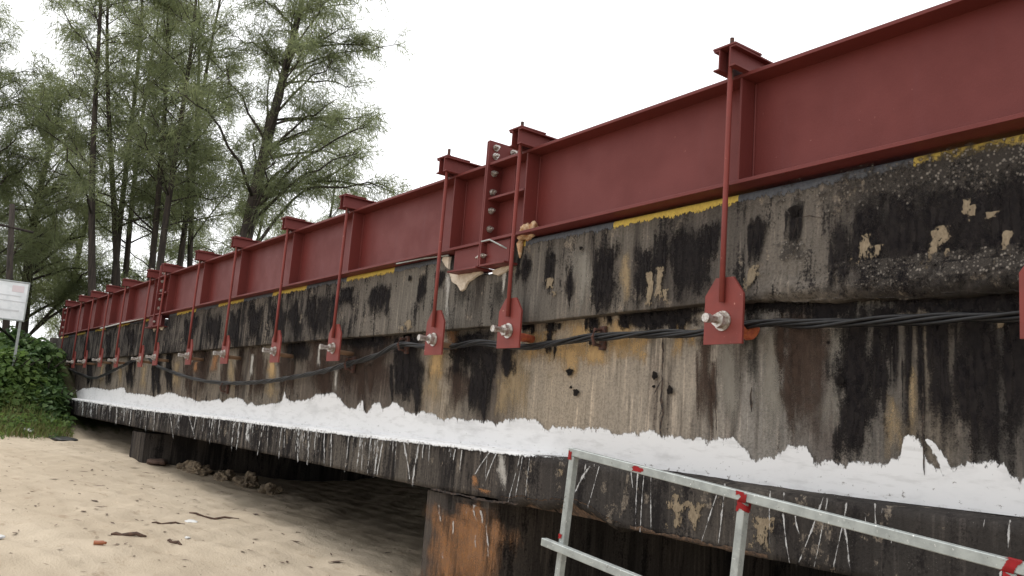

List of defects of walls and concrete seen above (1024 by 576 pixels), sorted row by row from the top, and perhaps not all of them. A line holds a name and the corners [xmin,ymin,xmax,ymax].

spalling [776,134,1024,222]
leakage [367,281,391,317]
leakage [416,269,466,314]
flaking render [442,257,509,292]
peeling [645,266,669,306]
leakage [493,168,1024,471]
spalling [773,225,1024,298]
leakage [83,287,529,423]
leakage [498,455,507,485]
corrosion [427,475,503,576]
spalling [502,495,617,523]
peeling [630,493,781,561]